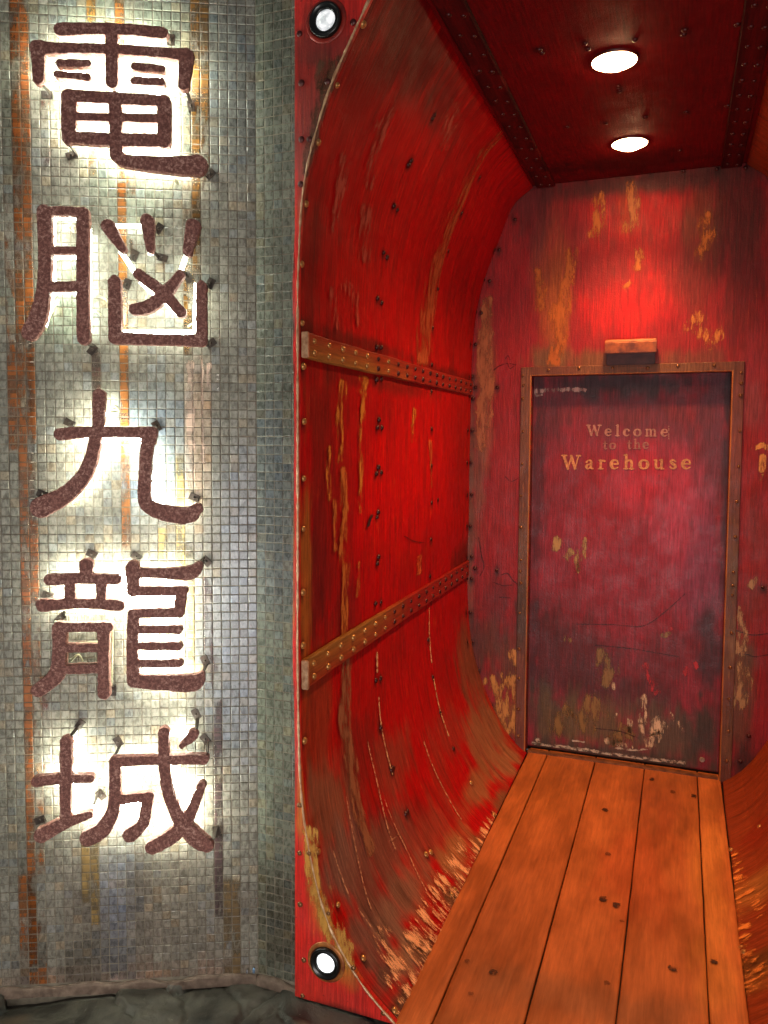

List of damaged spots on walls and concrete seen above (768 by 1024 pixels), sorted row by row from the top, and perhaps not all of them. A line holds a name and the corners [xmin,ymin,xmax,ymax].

rust [115,0,124,23]
rust [191,0,209,159]
rust [117,167,135,330]
peeling [621,181,640,233]
peeling [683,311,724,350]
rust [120,345,129,426]
rust [5,0,49,984]
rust [121,439,130,546]
peeling [552,536,587,573]
peeling [549,648,683,749]
peeling [373,811,497,1017]
peeling [731,853,766,994]